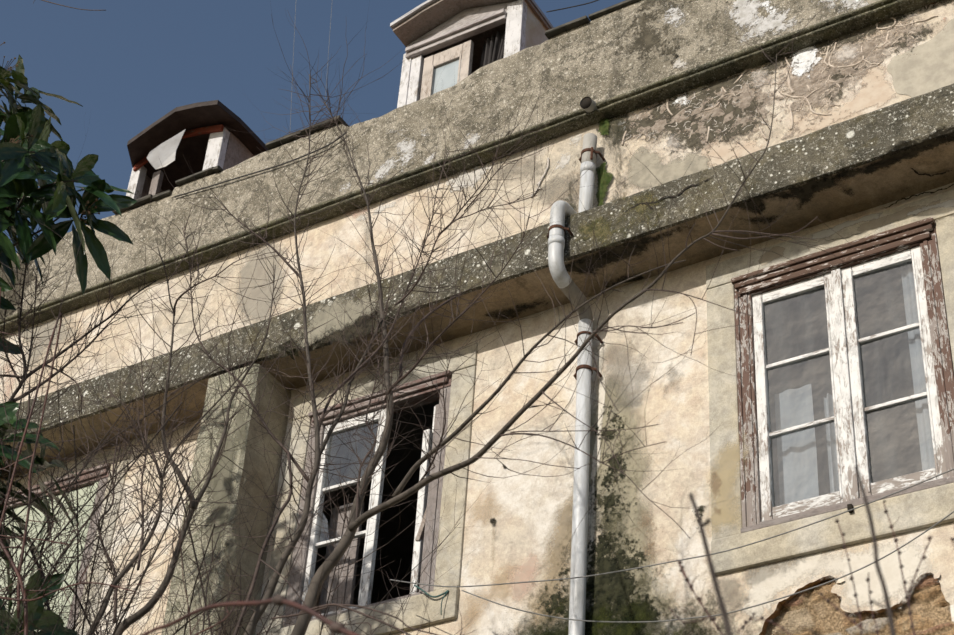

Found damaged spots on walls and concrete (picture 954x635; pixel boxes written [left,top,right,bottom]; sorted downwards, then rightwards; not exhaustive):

damp [603,0,954,202]
flaking render [790,65,896,137]
flaking render [700,140,762,166]
damp [731,125,954,224]
damp [586,380,670,633]
damp [530,500,573,625]
spalling [758,572,954,635]